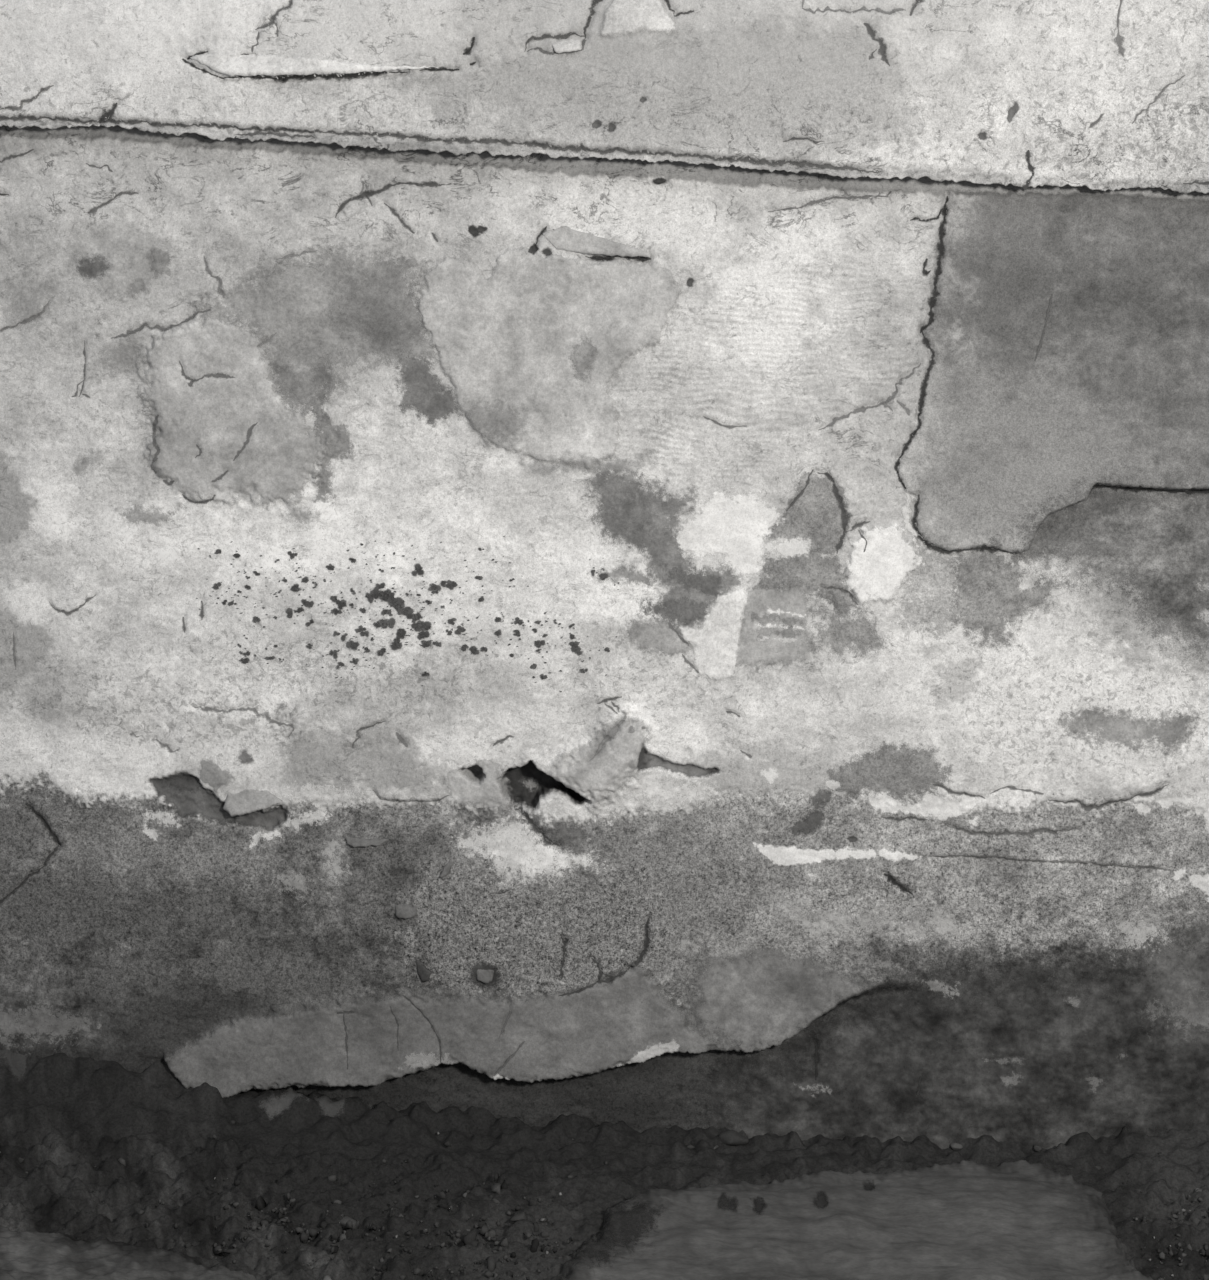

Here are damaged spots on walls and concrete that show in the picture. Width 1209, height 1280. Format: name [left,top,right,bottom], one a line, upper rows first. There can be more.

crack [802,0,923,66]
crack [335,181,451,242]
crack [0,85,891,214]
crack [819,196,1014,554]
flaking render [893,180,1209,661]
damp [198,452,811,692]
flaking render [149,750,287,833]
flaking render [445,759,587,854]
damp [441,757,728,894]
damp [752,842,922,866]
flaking render [164,957,717,1098]
damp [692,873,1209,1150]